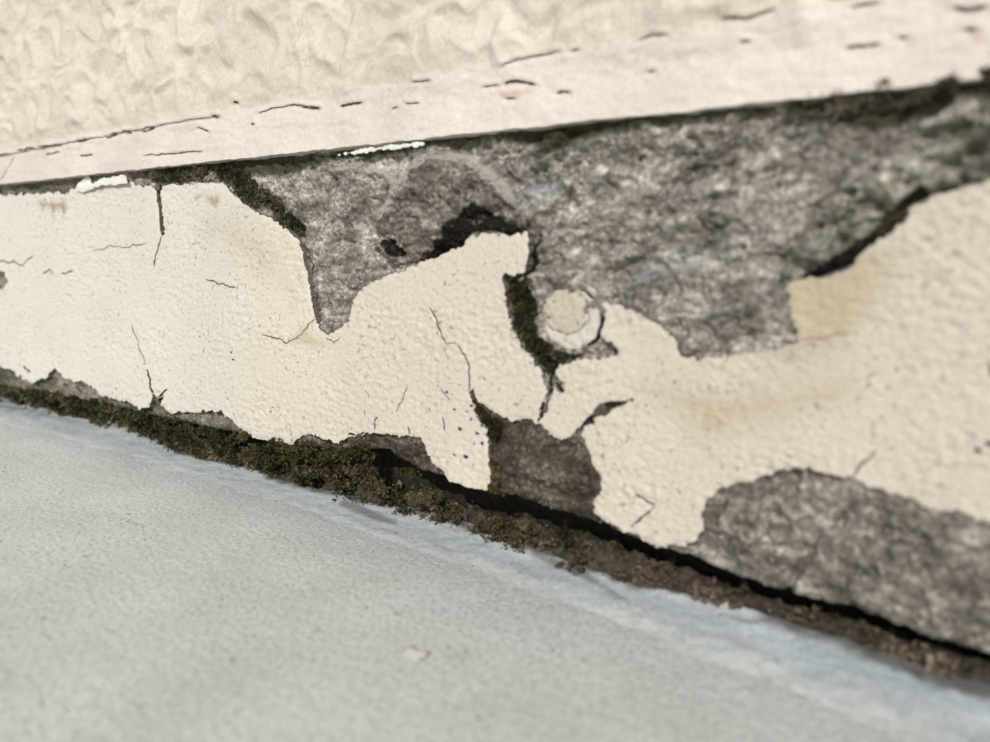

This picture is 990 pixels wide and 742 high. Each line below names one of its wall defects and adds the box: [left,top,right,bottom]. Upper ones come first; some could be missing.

crack [0,101,362,179]
crack [93,183,165,264]
crack [0,256,73,275]
peeling [0,93,990,538]
crack [131,324,167,404]
crack [430,308,470,430]
crack [348,388,410,436]
peeling [661,466,990,653]